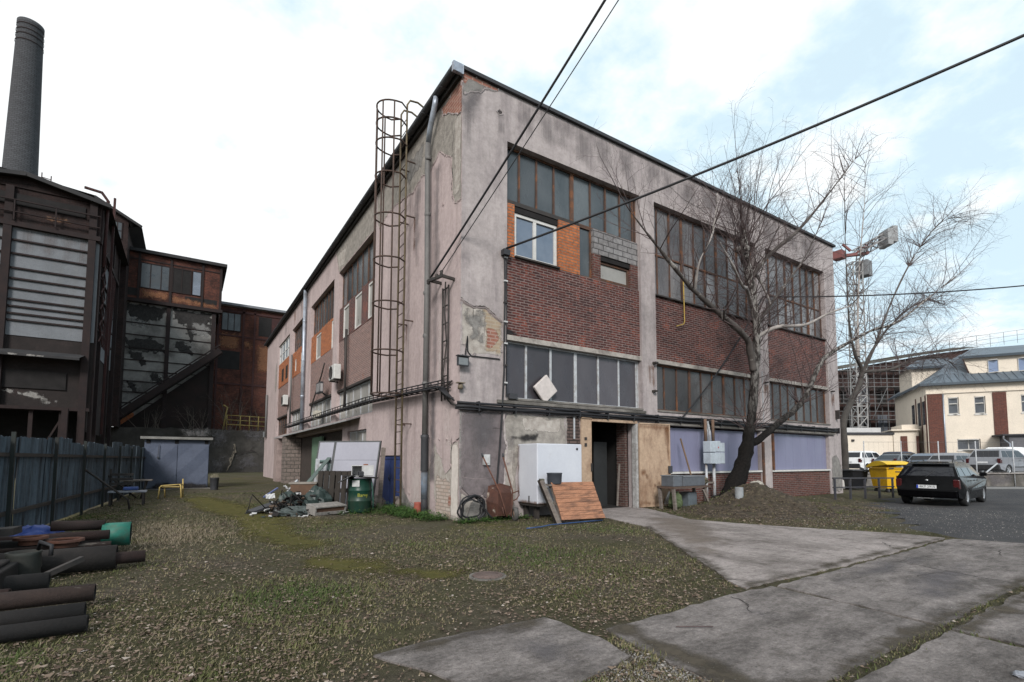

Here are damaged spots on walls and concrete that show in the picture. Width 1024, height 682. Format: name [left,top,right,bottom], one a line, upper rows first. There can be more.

flaking render [336,72,500,272]
flaking render [460,298,503,356]
flaking render [3,389,56,404]
flaking render [427,410,580,521]